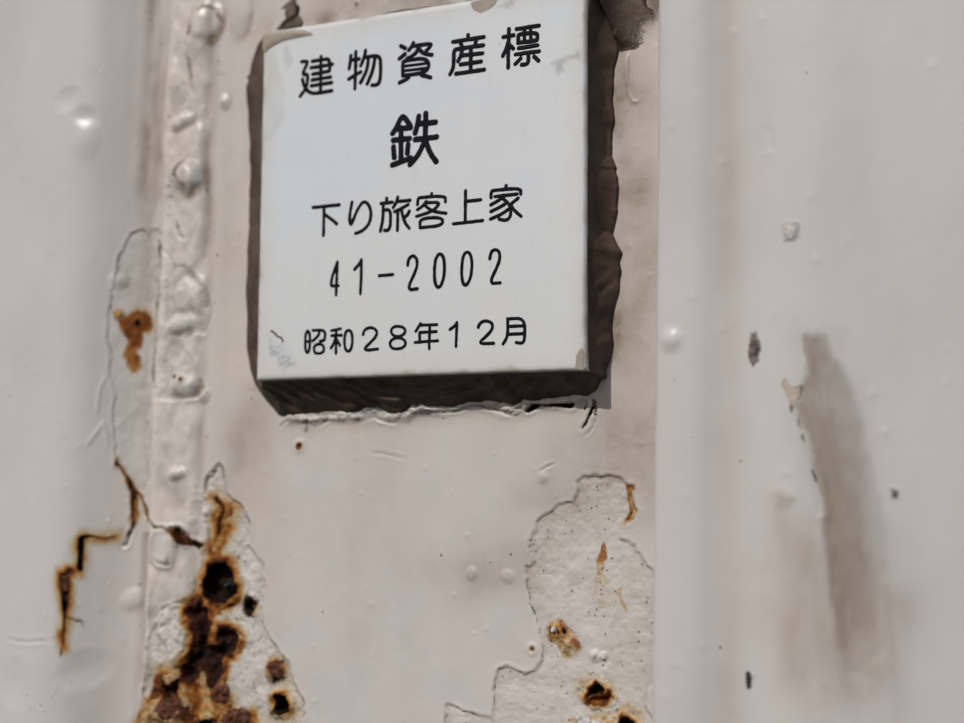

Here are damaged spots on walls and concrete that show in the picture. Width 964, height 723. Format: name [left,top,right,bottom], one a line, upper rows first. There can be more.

corrosion [112,302,156,377]
peeling [140,600,187,710]
corrosion [129,483,305,723]
peeling [164,468,304,723]
peeling [443,474,654,723]
corrosion [546,619,583,661]
corrosion [571,670,617,723]
damp [781,340,864,612]